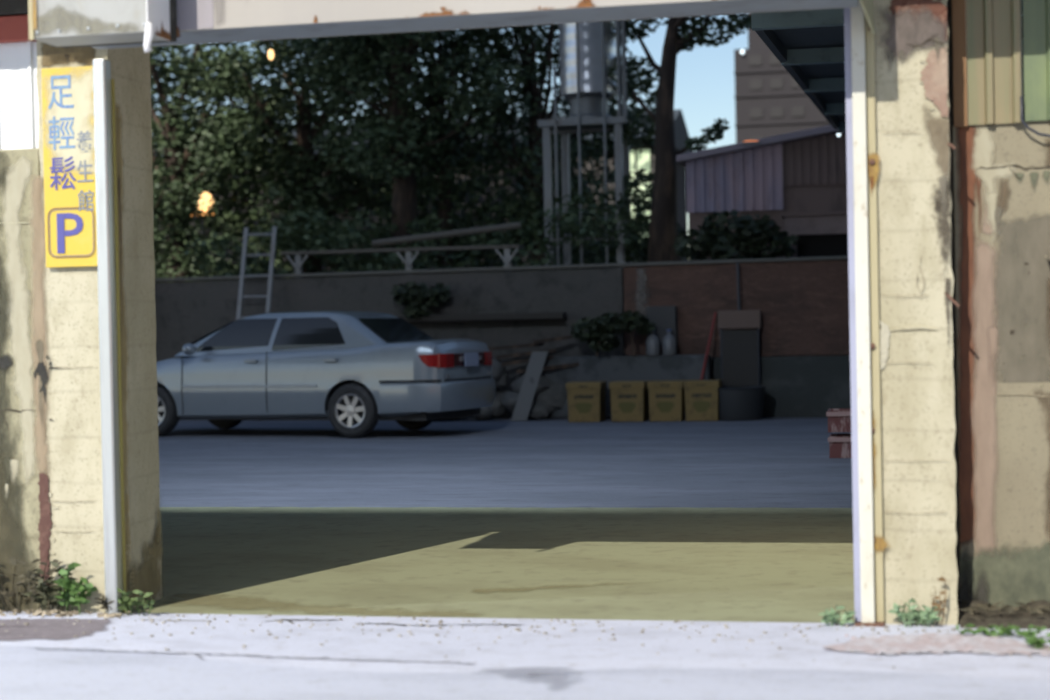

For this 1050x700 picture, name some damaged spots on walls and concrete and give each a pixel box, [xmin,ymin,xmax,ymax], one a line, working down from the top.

corrosion [155,24,180,41]
corrosion [419,7,470,17]
corrosion [572,0,595,8]
peeling [888,0,948,118]
leakage [0,157,110,641]
corrosion [957,126,982,545]
leakage [958,128,1050,607]